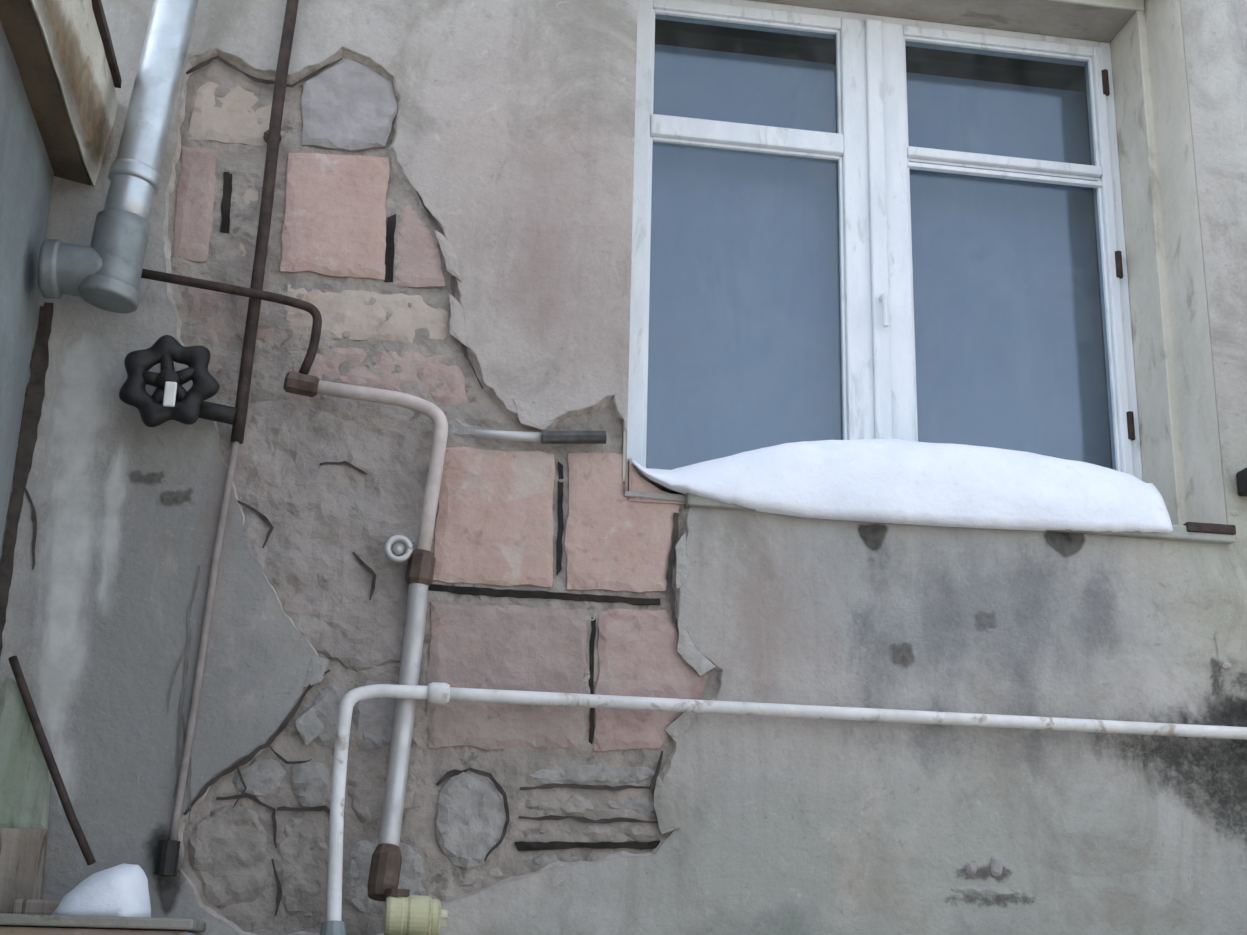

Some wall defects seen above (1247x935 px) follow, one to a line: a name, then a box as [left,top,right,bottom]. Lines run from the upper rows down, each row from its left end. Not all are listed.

water stain [38,331,126,802]
flaking render [162,46,723,935]
water stain [1150,694,1247,829]